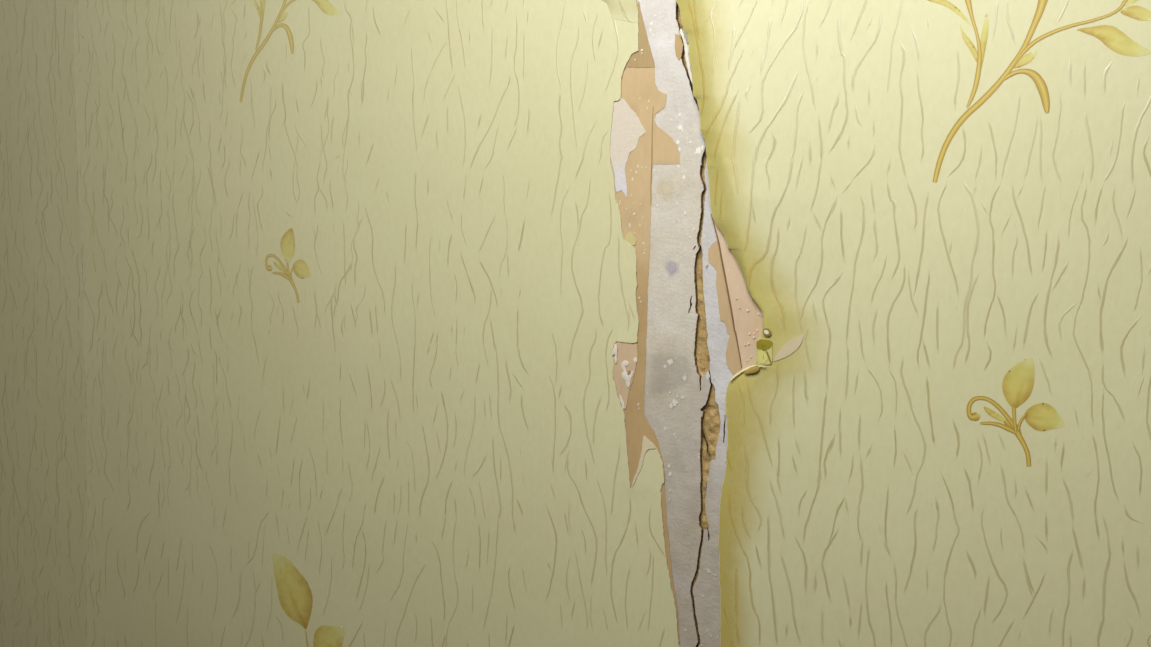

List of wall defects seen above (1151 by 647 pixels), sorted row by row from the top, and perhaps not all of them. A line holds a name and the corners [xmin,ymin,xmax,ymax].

flaking render [602,0,734,647]
crack [676,2,699,111]
crack [688,140,725,647]
water stain [676,0,775,339]
water stain [718,363,762,647]